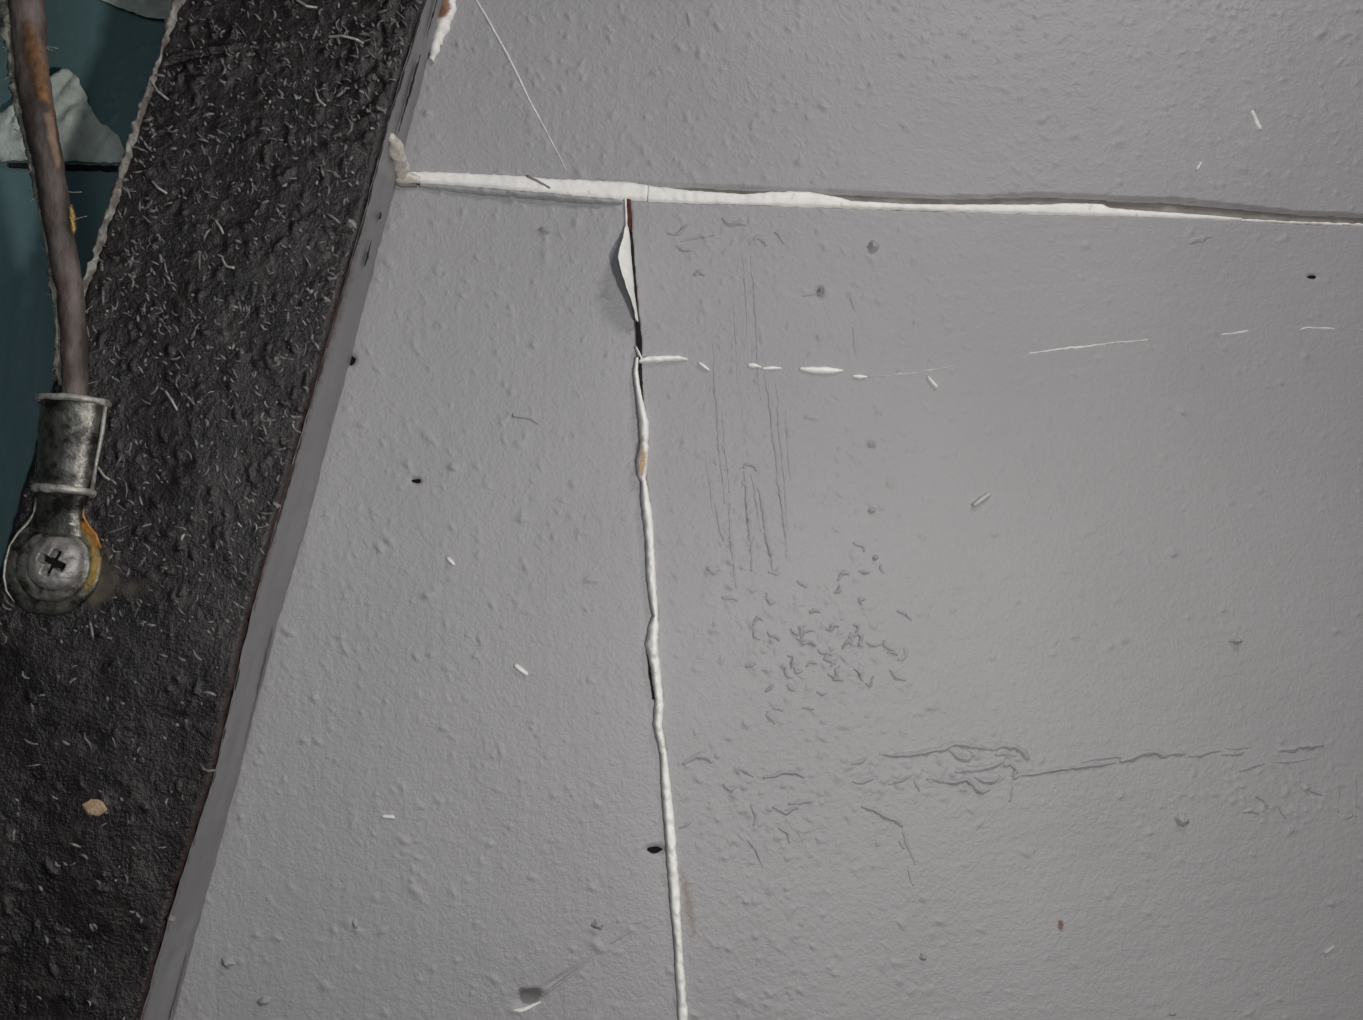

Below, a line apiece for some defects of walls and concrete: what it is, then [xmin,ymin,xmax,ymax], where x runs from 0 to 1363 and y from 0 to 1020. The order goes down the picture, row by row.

peeling [101,0,173,20]
peeling [0,105,27,163]
peeling [50,69,125,164]
crack [389,133,1363,1020]